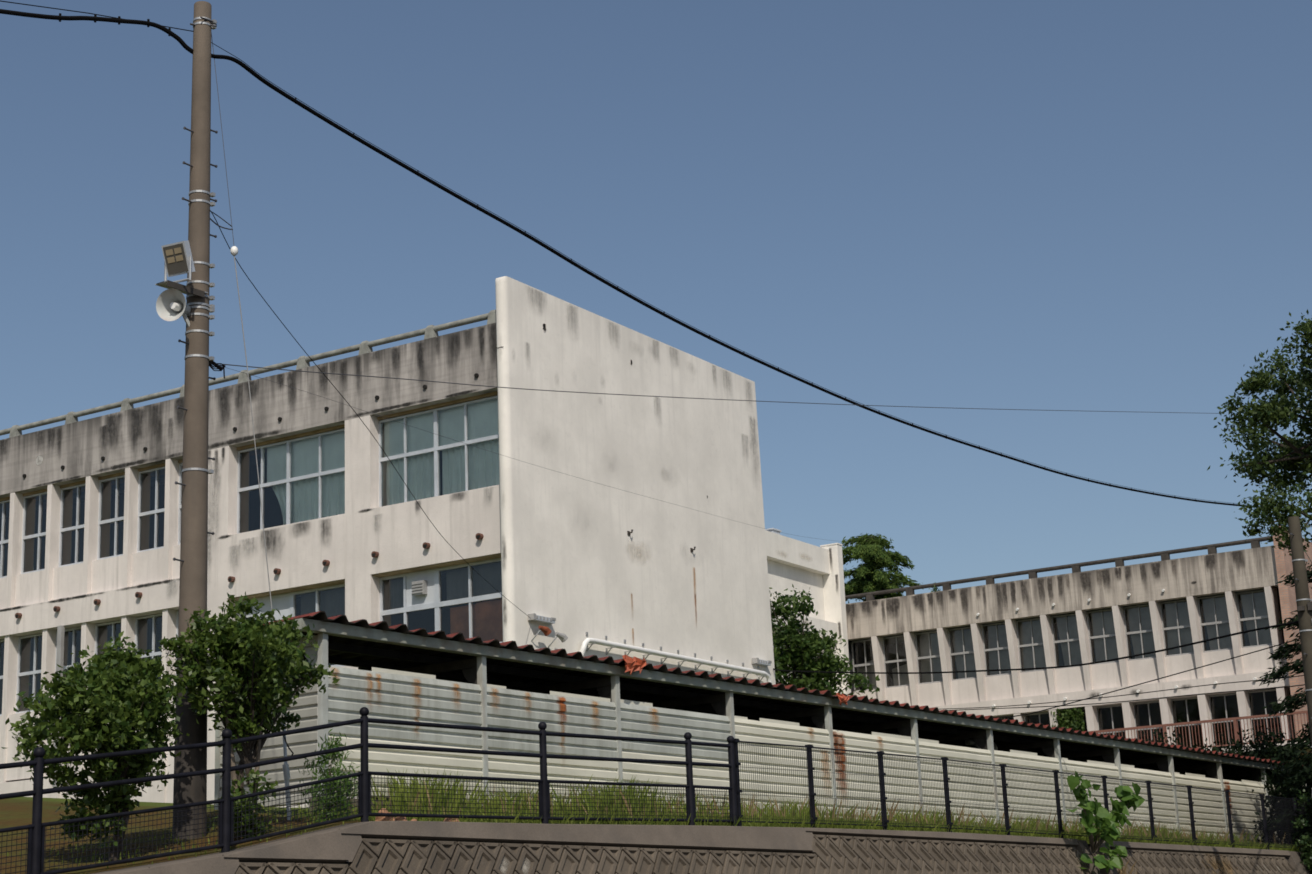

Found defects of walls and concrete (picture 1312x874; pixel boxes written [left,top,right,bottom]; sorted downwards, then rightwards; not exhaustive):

water stain [101,399,184,445]
water stain [220,381,257,418]
water stain [277,374,295,397]
water stain [320,352,376,386]
water stain [355,399,428,416]
water stain [418,326,497,371]
water stain [208,431,279,481]
water stain [838,560,1176,636]
corrosion [558,697,566,739]
corrosion [825,733,846,784]